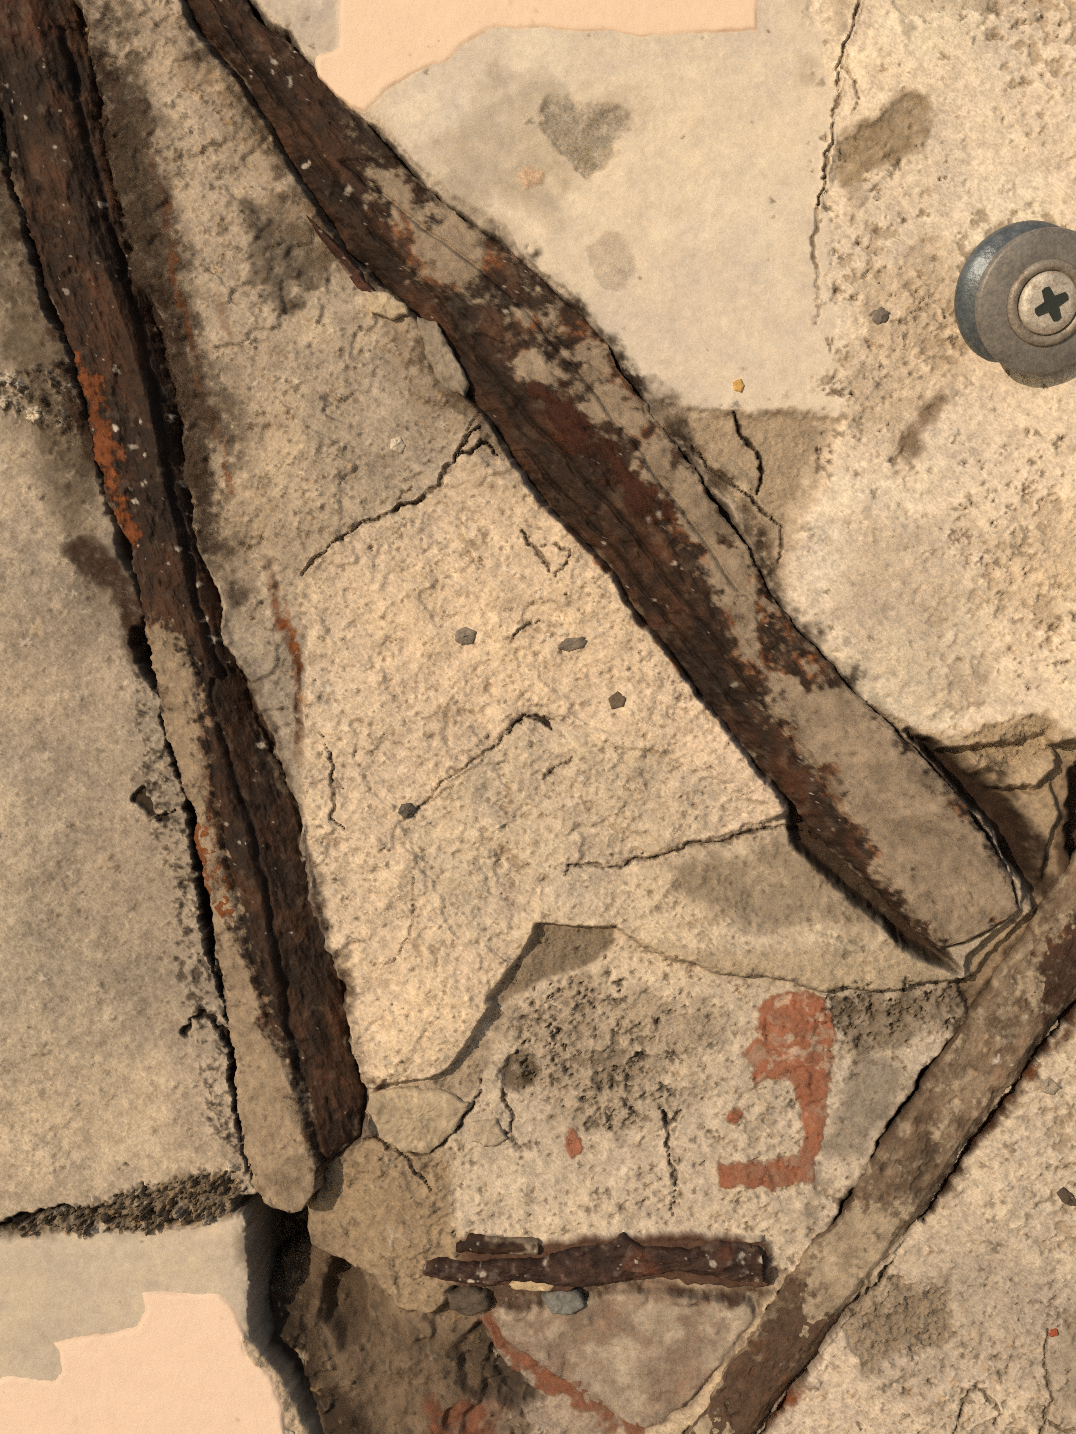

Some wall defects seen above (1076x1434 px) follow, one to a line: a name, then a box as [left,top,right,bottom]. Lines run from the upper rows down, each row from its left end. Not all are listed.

crack [823,82,859,184]
rust [294,192,401,299]
rust [563,298,652,403]
crack [320,426,498,556]
crack [692,412,783,559]
rust [63,537,146,661]
crack [419,716,555,806]
rust [910,736,1076,896]
rust [786,796,948,962]
crack [0,1203,85,1227]
rust [423,1232,764,1314]
spalling [480,1314,644,1434]